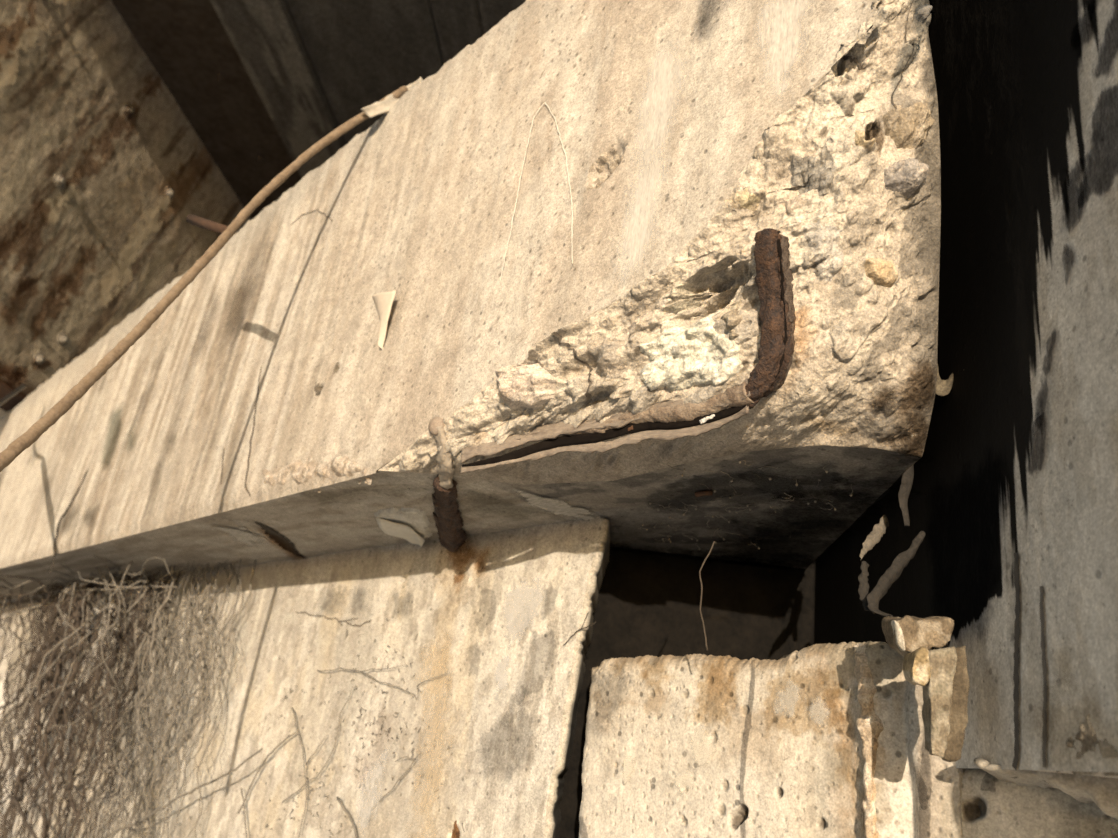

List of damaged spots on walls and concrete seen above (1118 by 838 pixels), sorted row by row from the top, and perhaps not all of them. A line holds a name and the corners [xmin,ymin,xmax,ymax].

crack [220,366,306,558]
spalling [262,0,941,520]
rust [428,228,796,552]
spalling [891,620,905,652]